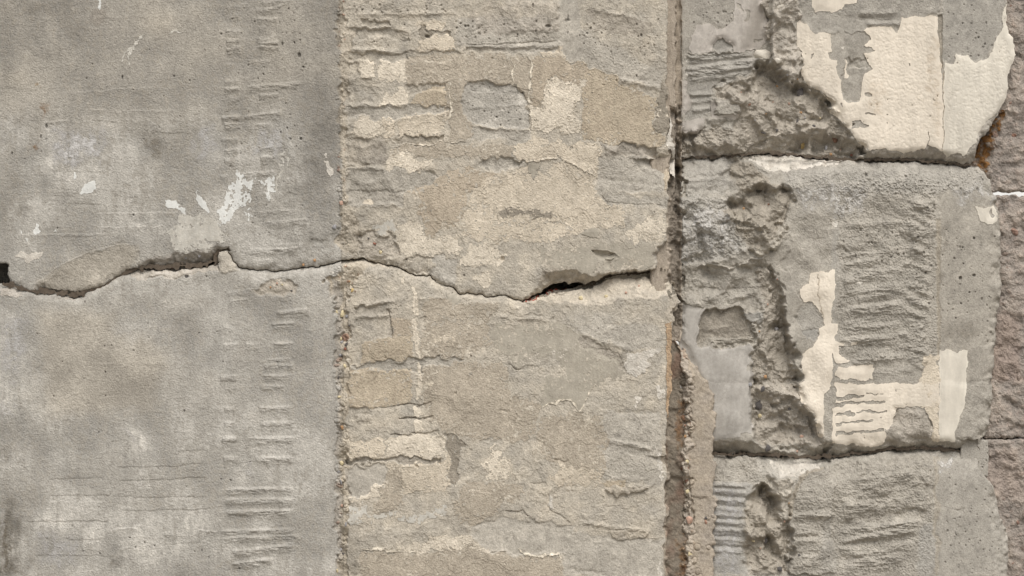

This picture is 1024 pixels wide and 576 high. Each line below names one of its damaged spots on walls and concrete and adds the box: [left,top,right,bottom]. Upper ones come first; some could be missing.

rust [975,110,1005,172]
crack [2,248,650,302]
peeling [323,0,1016,576]